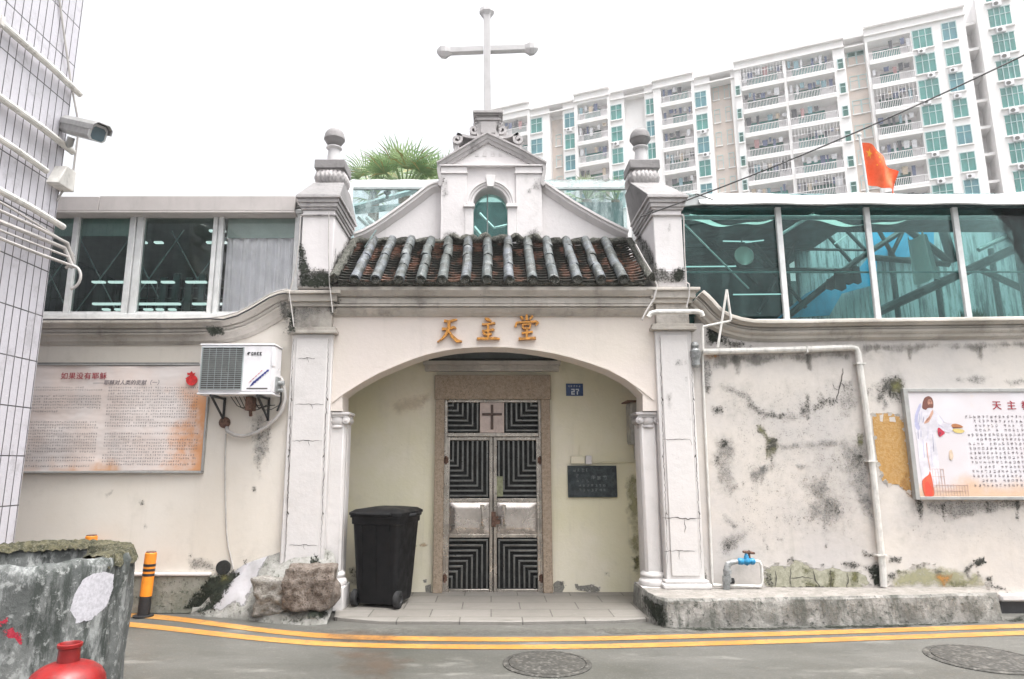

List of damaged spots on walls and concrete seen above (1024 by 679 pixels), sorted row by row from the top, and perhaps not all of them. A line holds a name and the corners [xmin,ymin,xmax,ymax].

damp [868,376,904,406]
damp [714,439,738,495]
damp [729,382,873,518]
peeling [870,412,912,496]
damp [807,480,841,525]
damp [184,555,244,615]
peeling [760,560,872,587]
peeling [888,562,990,590]